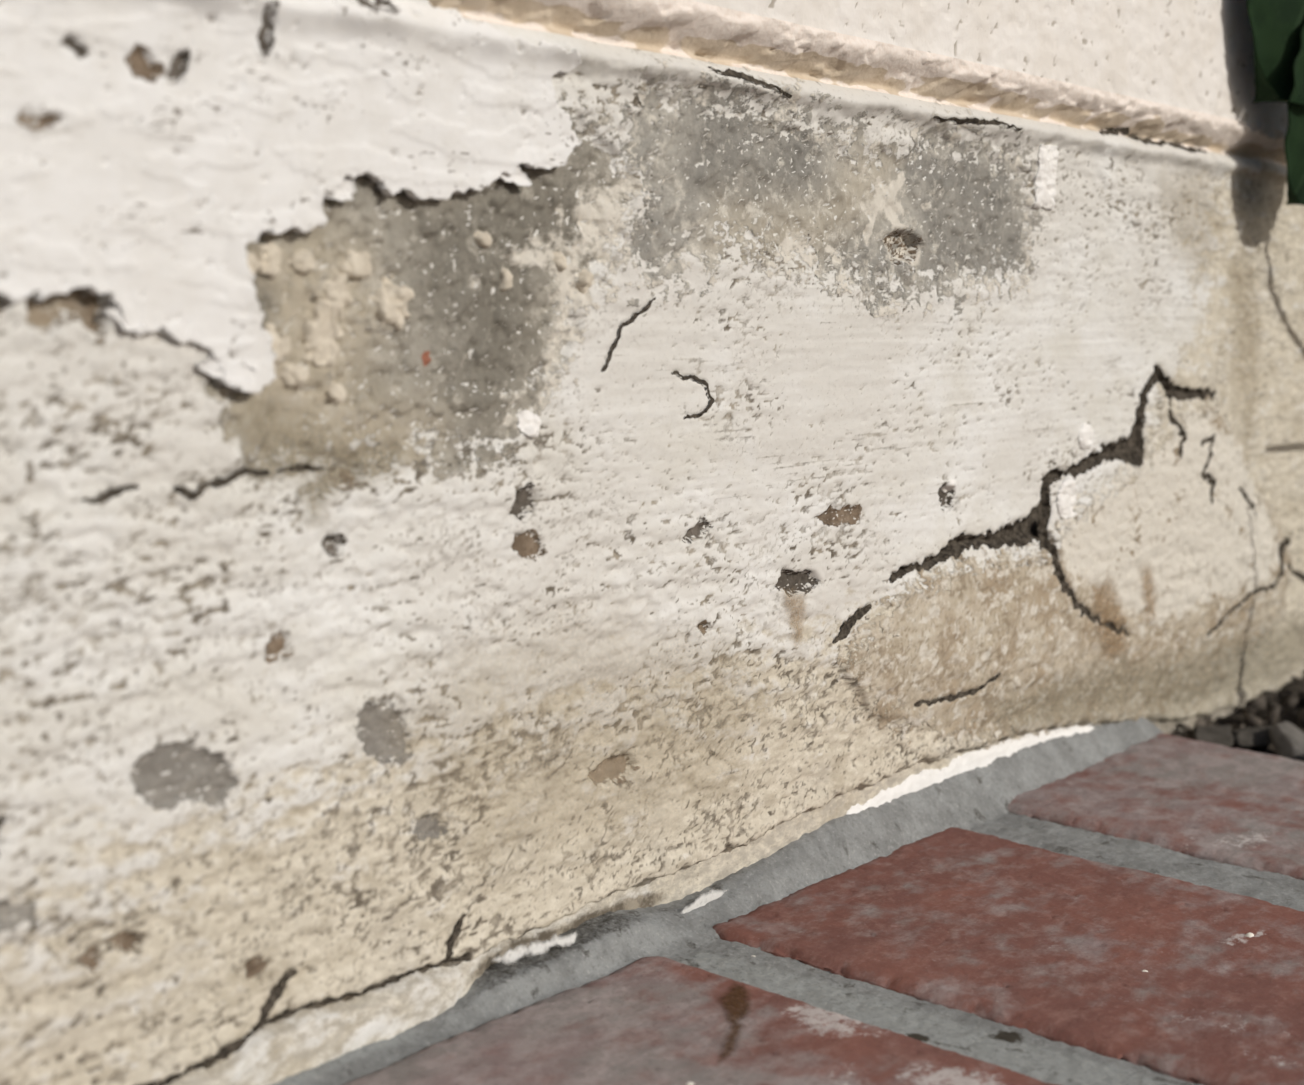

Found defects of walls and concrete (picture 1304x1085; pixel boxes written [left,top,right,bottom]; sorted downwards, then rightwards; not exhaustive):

peeling [0,0,1043,515]
crack [602,297,656,371]
crack [673,370,715,419]
crack [834,365,1256,643]
crack [1207,537,1304,637]
peeling [130,739,241,810]
crack [152,914,471,1085]